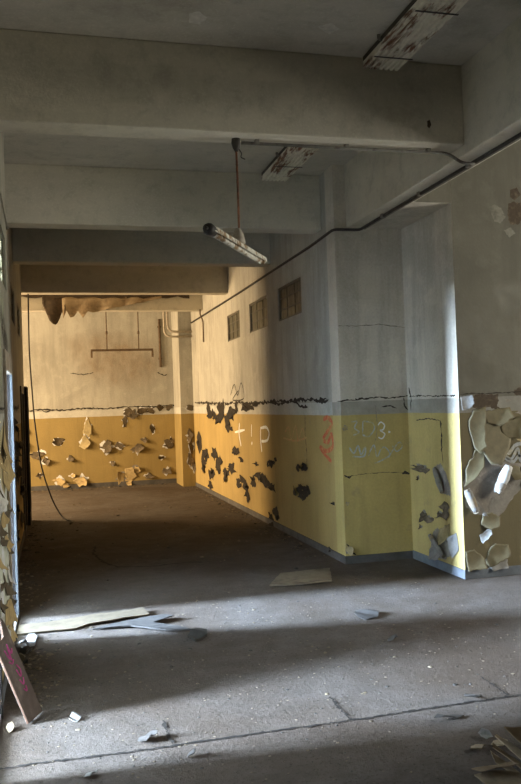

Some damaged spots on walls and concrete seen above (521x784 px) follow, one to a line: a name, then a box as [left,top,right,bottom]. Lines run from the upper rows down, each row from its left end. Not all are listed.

peeling [122,404,173,427]
peeling [206,400,260,433]
peeling [52,473,89,488]
peeling [79,416,174,485]
peeling [185,428,277,502]
peeling [293,484,311,501]
peeling [411,387,521,572]
peeling [0,418,50,643]
peeling [268,506,280,527]